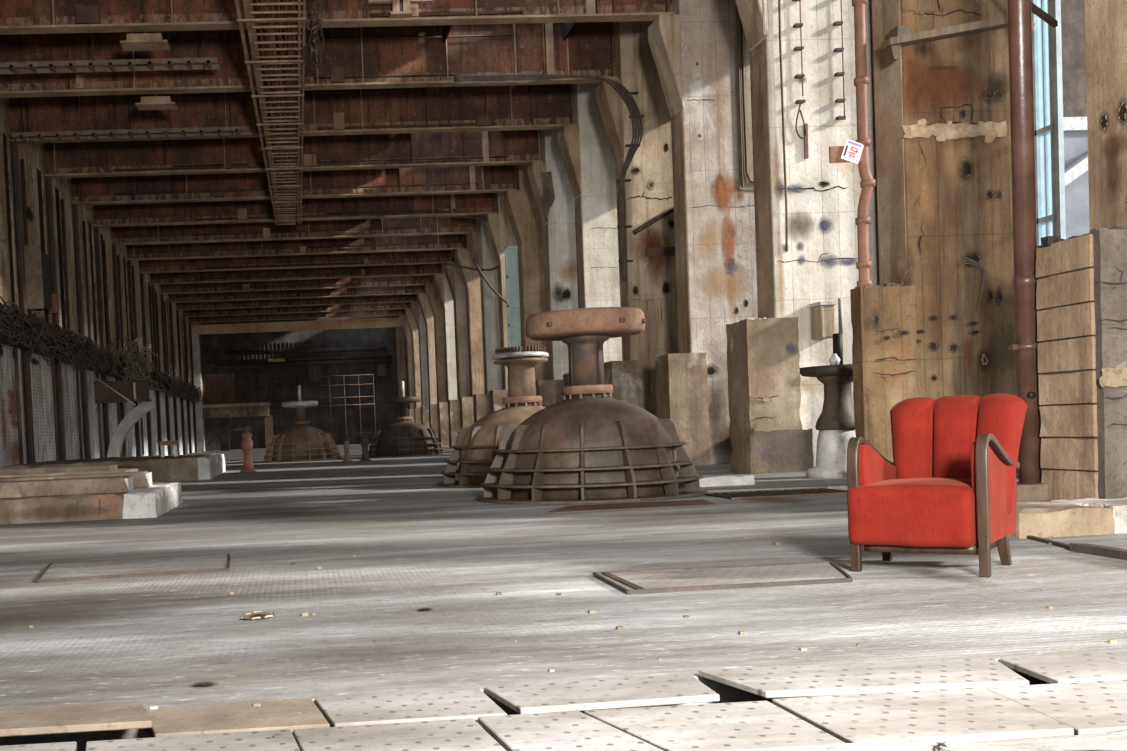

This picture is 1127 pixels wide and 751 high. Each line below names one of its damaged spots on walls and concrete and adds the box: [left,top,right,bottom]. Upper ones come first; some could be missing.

crack [905,0,981,17]
peeling [936,110,966,142]
spalling [1100,101,1127,130]
rust [707,177,744,261]
peeling [1099,361,1127,387]